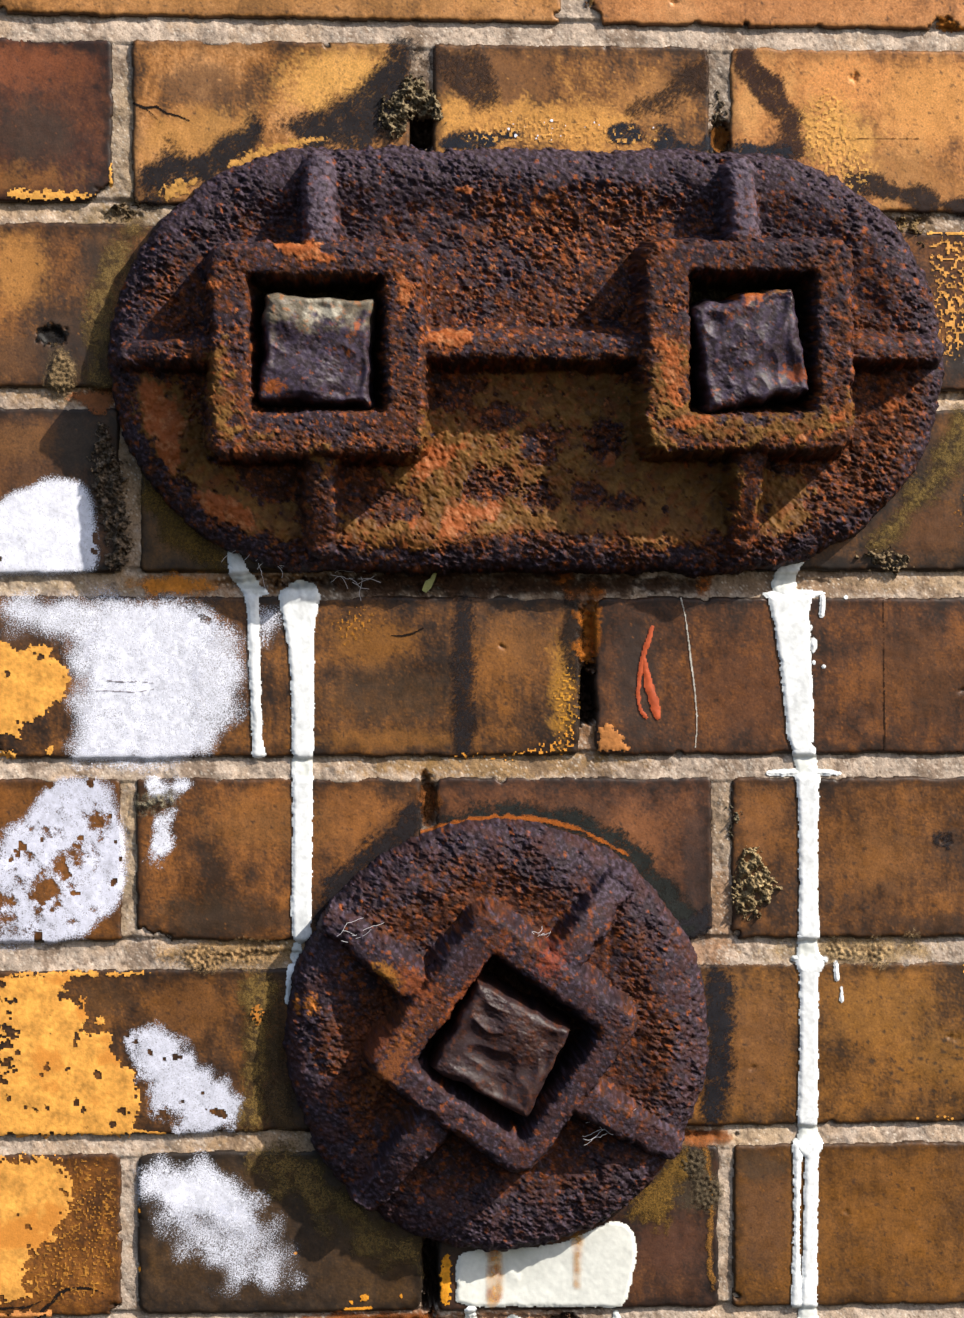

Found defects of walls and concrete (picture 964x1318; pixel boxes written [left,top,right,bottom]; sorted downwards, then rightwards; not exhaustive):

corrosion [417,783,628,856]
peeling [0,968,166,1139]